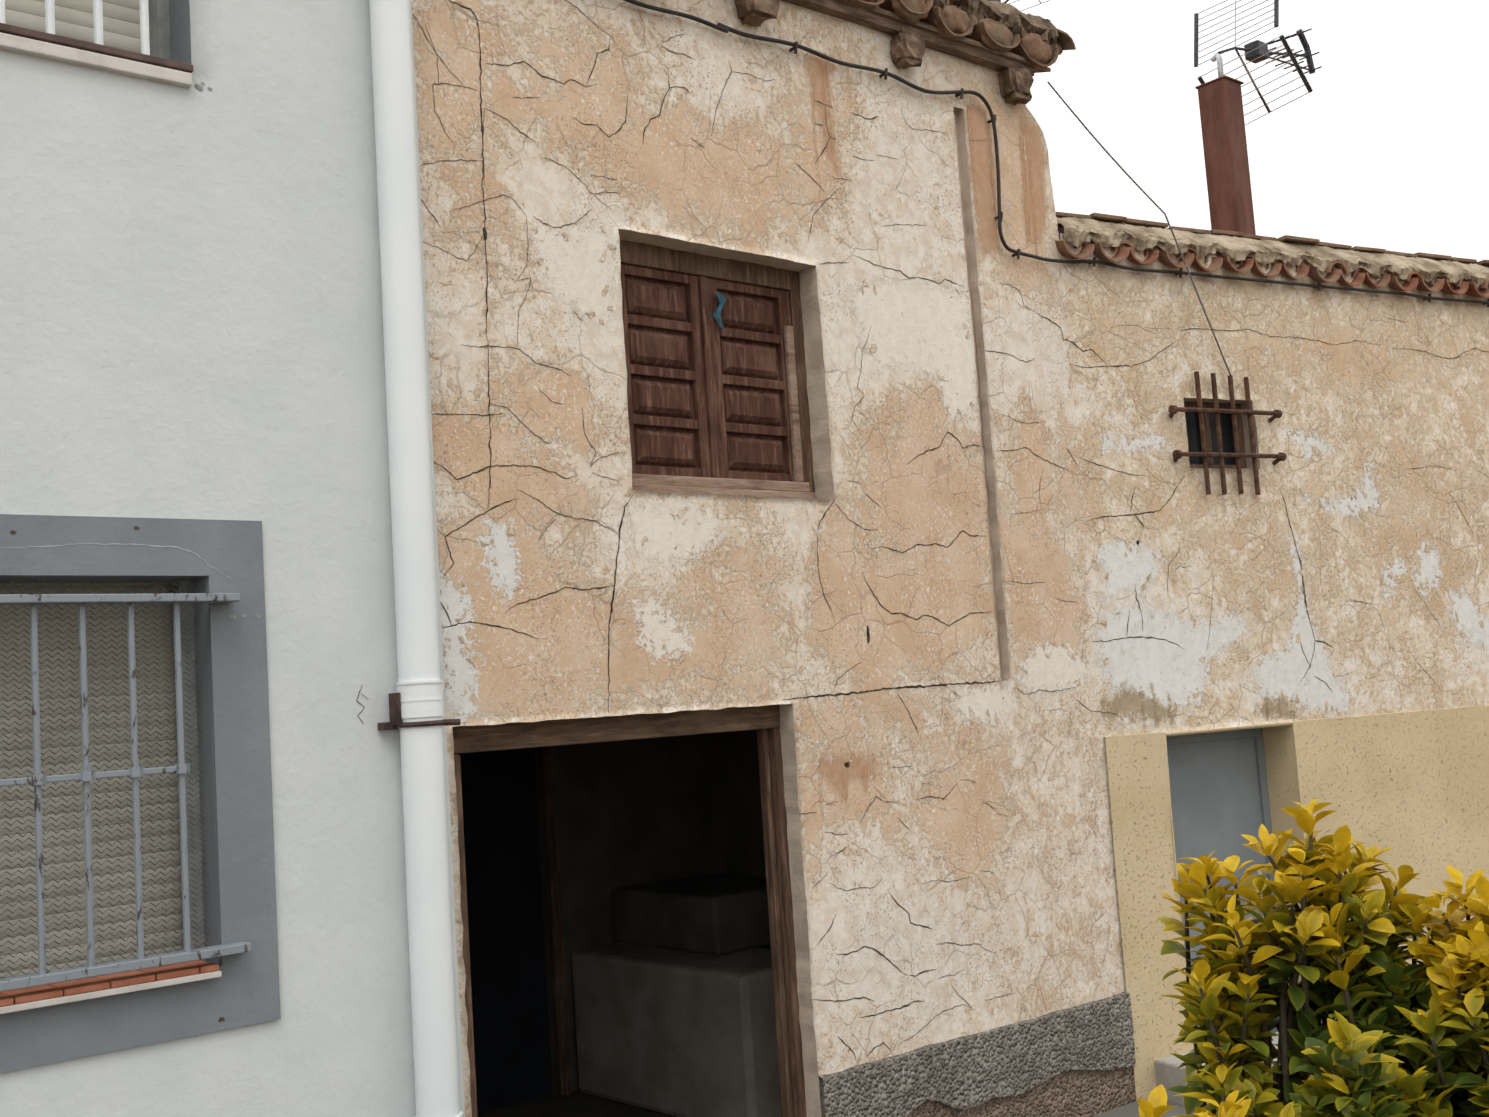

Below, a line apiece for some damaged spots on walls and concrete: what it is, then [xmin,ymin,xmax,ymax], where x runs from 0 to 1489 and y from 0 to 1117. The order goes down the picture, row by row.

crack [412,0,774,712]
crack [852,328,871,434]
flaking render [439,511,533,722]
flaking render [623,496,730,669]
crack [817,481,992,626]
crack [906,415,1180,527]
flaking render [951,532,1354,736]
crack [1093,548,1213,648]
crack [1279,488,1334,692]
crack [1409,465,1489,533]
crack [782,663,1123,1062]